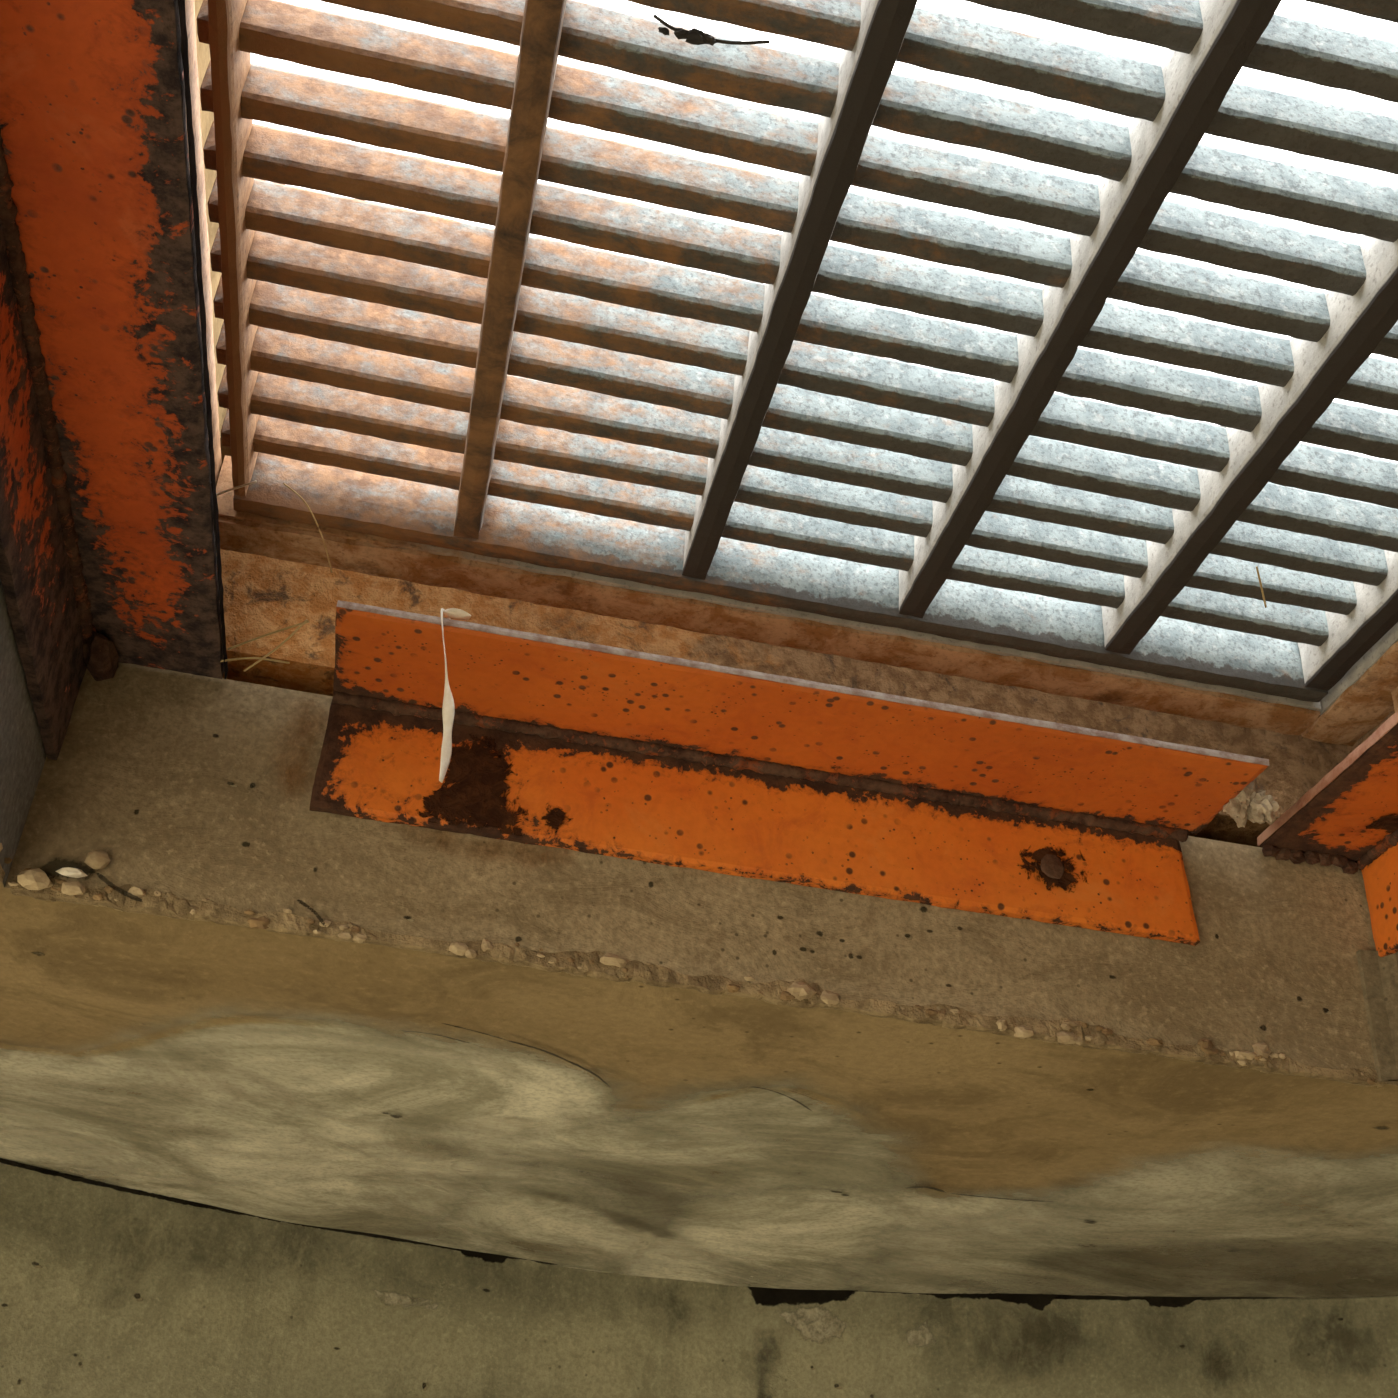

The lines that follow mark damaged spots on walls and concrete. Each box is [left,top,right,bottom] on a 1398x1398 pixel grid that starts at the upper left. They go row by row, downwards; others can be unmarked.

rust [416,734,573,836]
rust [1366,814,1398,834]
rust [1018,846,1087,893]